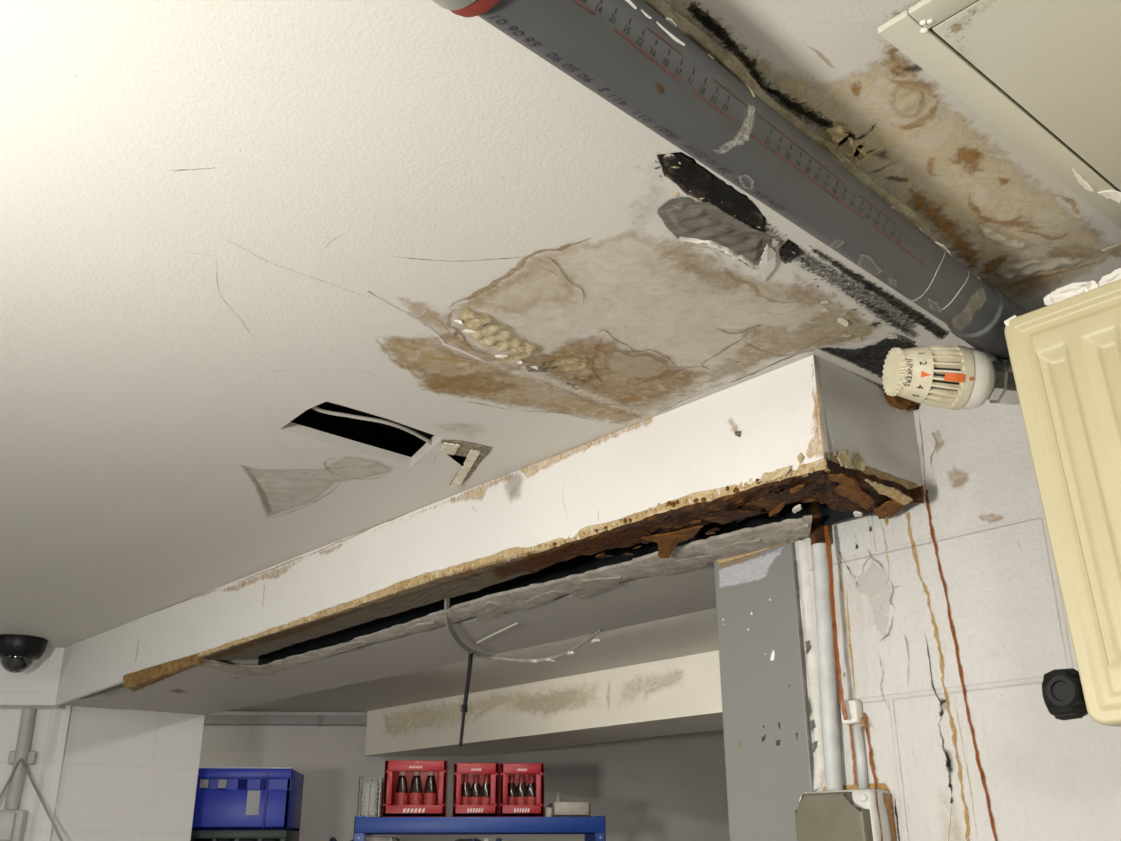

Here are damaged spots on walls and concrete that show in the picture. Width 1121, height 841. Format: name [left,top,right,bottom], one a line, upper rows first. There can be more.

water stain [843,48,1012,274]
water stain [393,312,522,404]
water stain [457,241,582,302]
water stain [522,245,950,429]
flaking render [435,439,493,488]
flaking render [173,450,919,791]
rust [123,458,998,841]
crack [925,636,953,841]